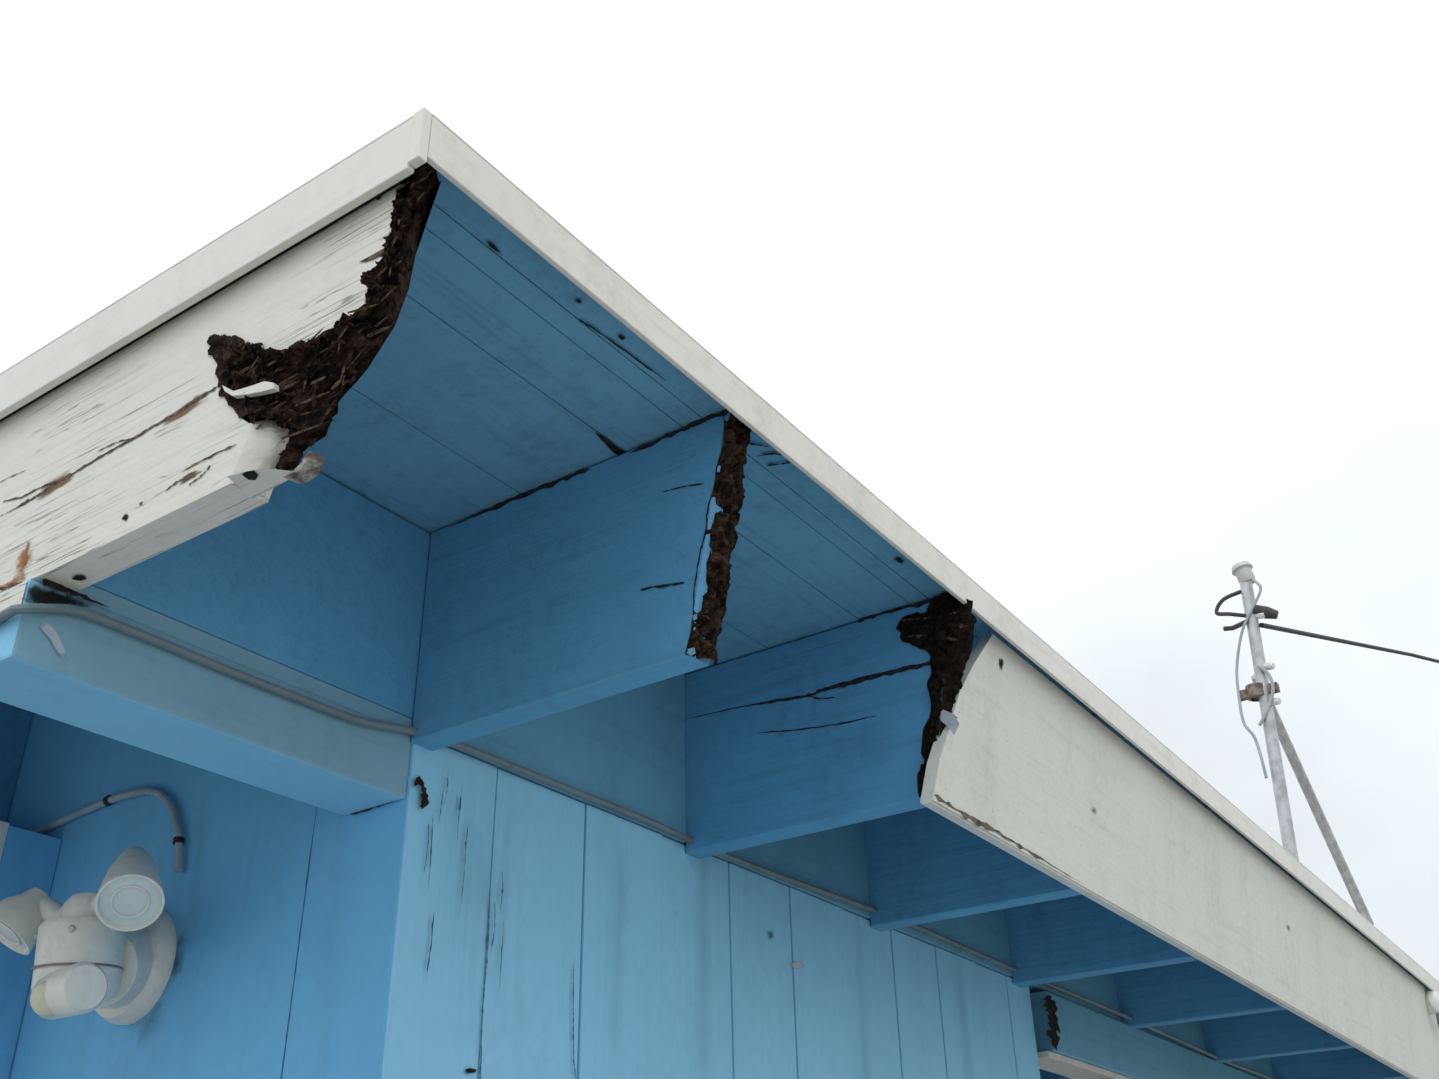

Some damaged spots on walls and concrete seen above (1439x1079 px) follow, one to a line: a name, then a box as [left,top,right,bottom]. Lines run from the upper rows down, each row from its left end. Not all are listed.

peeling [222,381,279,399]
crack [1,387,216,516]
crack [749,443,790,466]
crack [663,483,704,492]
crack [687,662,930,733]
peeling [939,710,959,735]